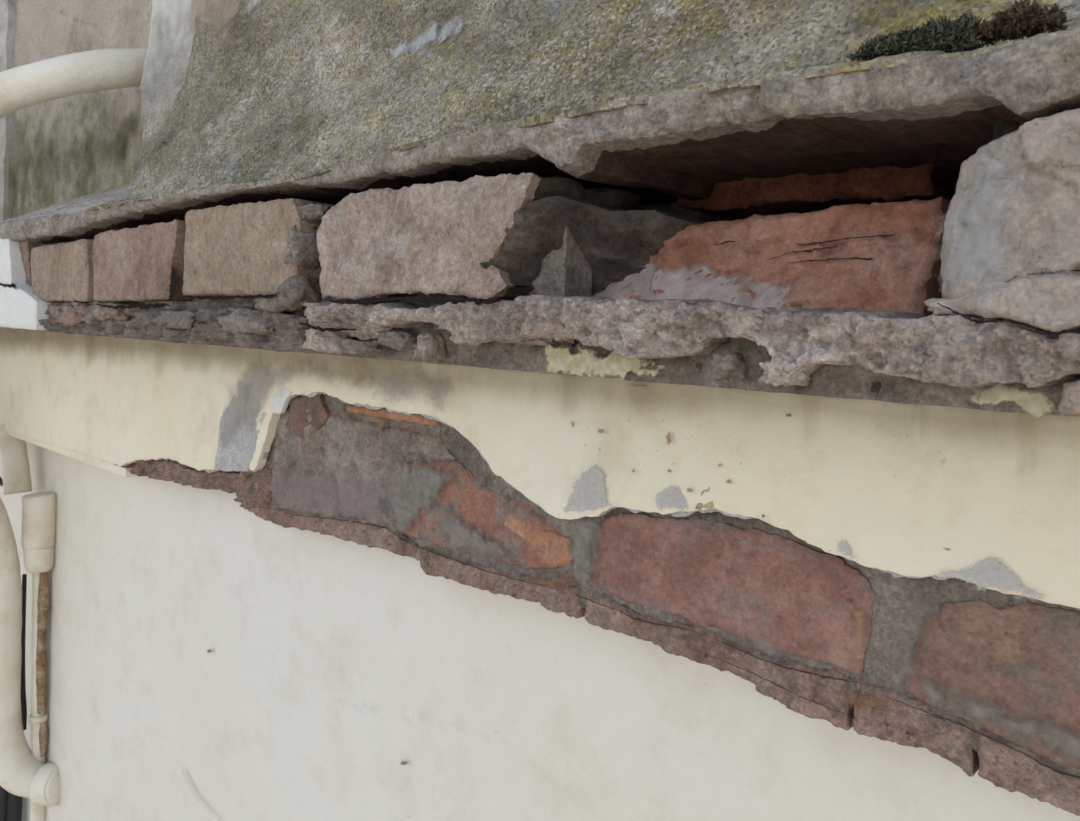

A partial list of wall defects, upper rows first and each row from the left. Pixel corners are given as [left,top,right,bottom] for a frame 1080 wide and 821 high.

crack [0,282,16,290]
spalling [19,241,43,287]
spalling [157,203,333,335]
spalling [591,163,982,317]
crack [769,234,895,263]
spalling [49,302,135,327]
crack [937,303,1080,335]
spalling [302,323,576,362]
spalling [710,352,811,388]
spalling [128,387,1080,816]